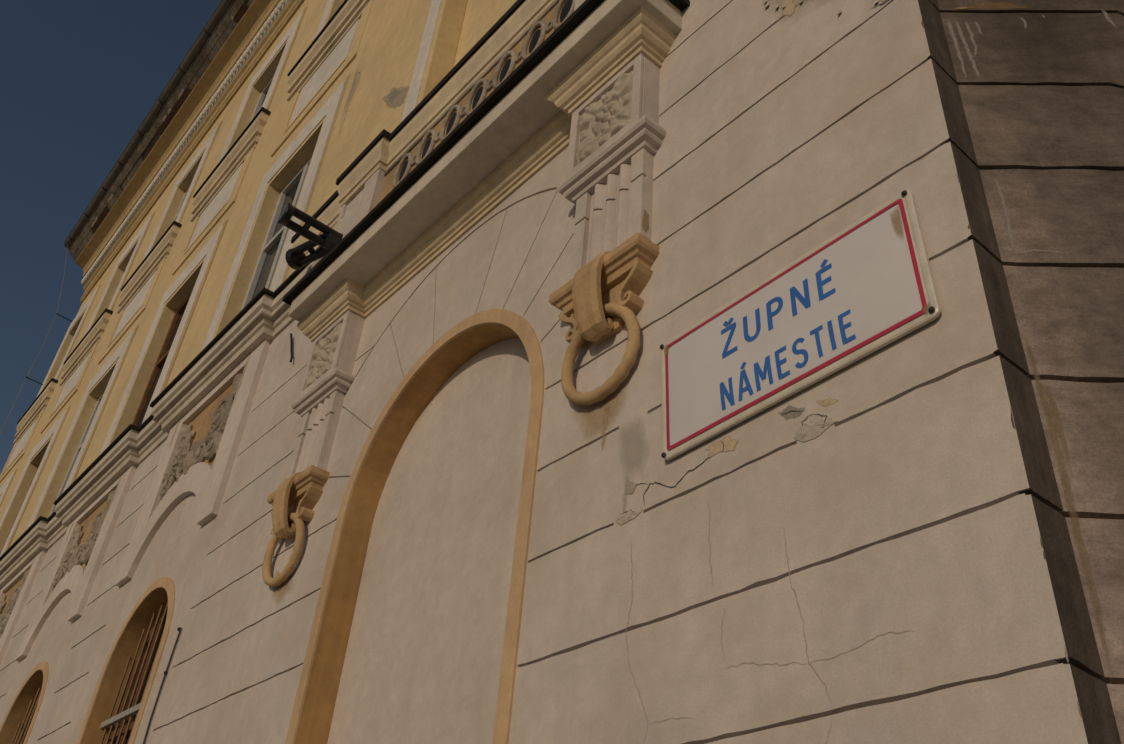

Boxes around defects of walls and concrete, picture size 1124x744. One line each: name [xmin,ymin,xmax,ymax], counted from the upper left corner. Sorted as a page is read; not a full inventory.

flaking render [955,1,1029,9]
spalling [780,398,838,420]
spalling [706,436,739,457]
crack [624,457,710,505]
crack [626,546,687,741]
crack [708,504,916,744]